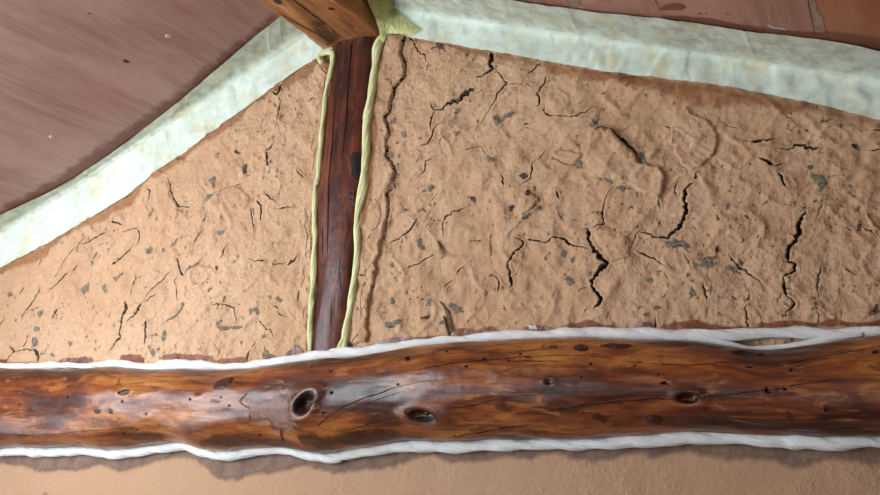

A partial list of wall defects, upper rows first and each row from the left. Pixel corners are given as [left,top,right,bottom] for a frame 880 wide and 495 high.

crack [0,177,208,363]
crack [210,81,316,363]
crack [365,35,712,328]
crack [726,103,855,328]